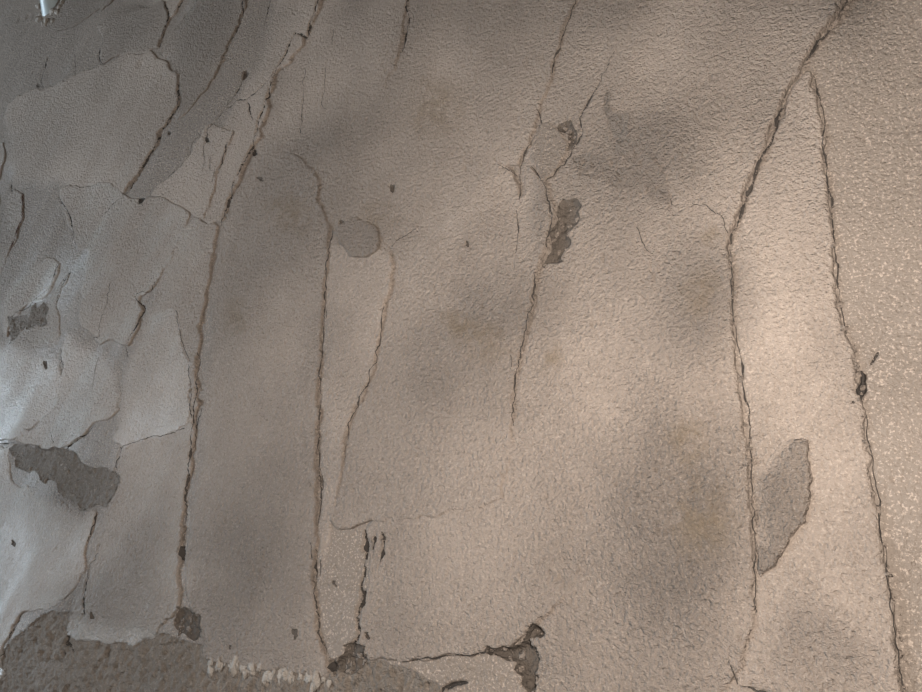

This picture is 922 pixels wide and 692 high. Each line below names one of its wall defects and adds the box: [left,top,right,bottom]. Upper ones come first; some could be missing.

crack [101,0,334,225]
crack [498,51,615,253]
crack [806,0,848,334]
flaking render [7,302,49,341]
flaking render [9,444,120,511]
crack [115,311,202,540]
crack [310,232,386,660]
crack [510,272,536,426]
crack [856,352,905,689]
flaking render [172,606,201,641]
flaking render [327,632,370,677]
flaking render [485,623,545,692]